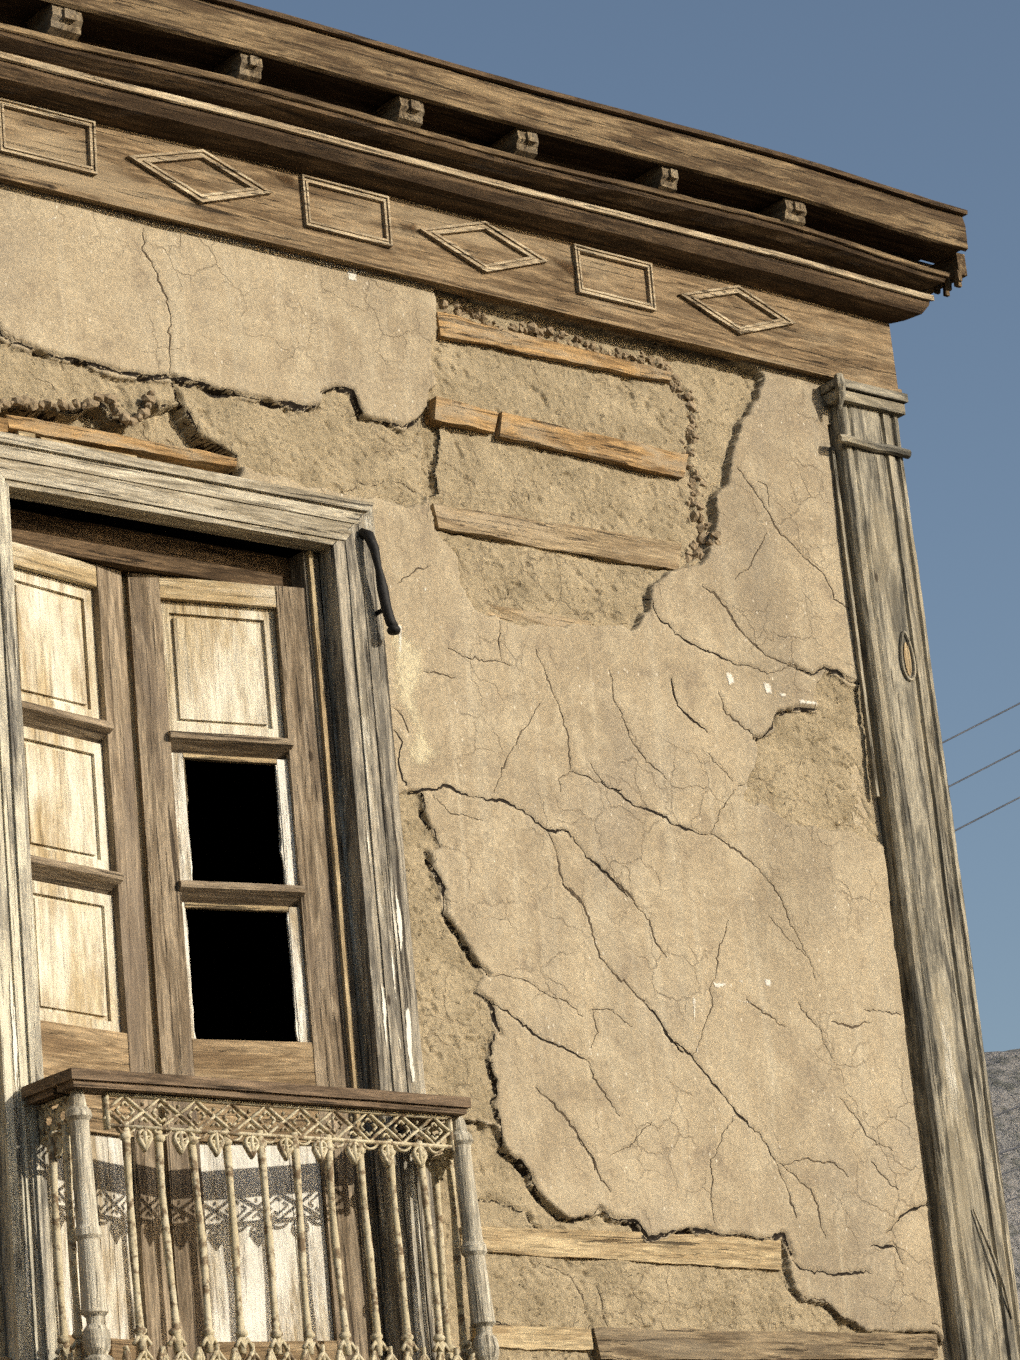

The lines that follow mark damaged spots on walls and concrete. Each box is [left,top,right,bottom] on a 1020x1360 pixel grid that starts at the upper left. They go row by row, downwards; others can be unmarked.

crack [0,228,422,475]
spalling [0,285,761,630]
crack [392,466,926,1331]
spalling [436,1138,473,1350]
spalling [498,1347,594,1360]
spalling [485,1246,879,1333]